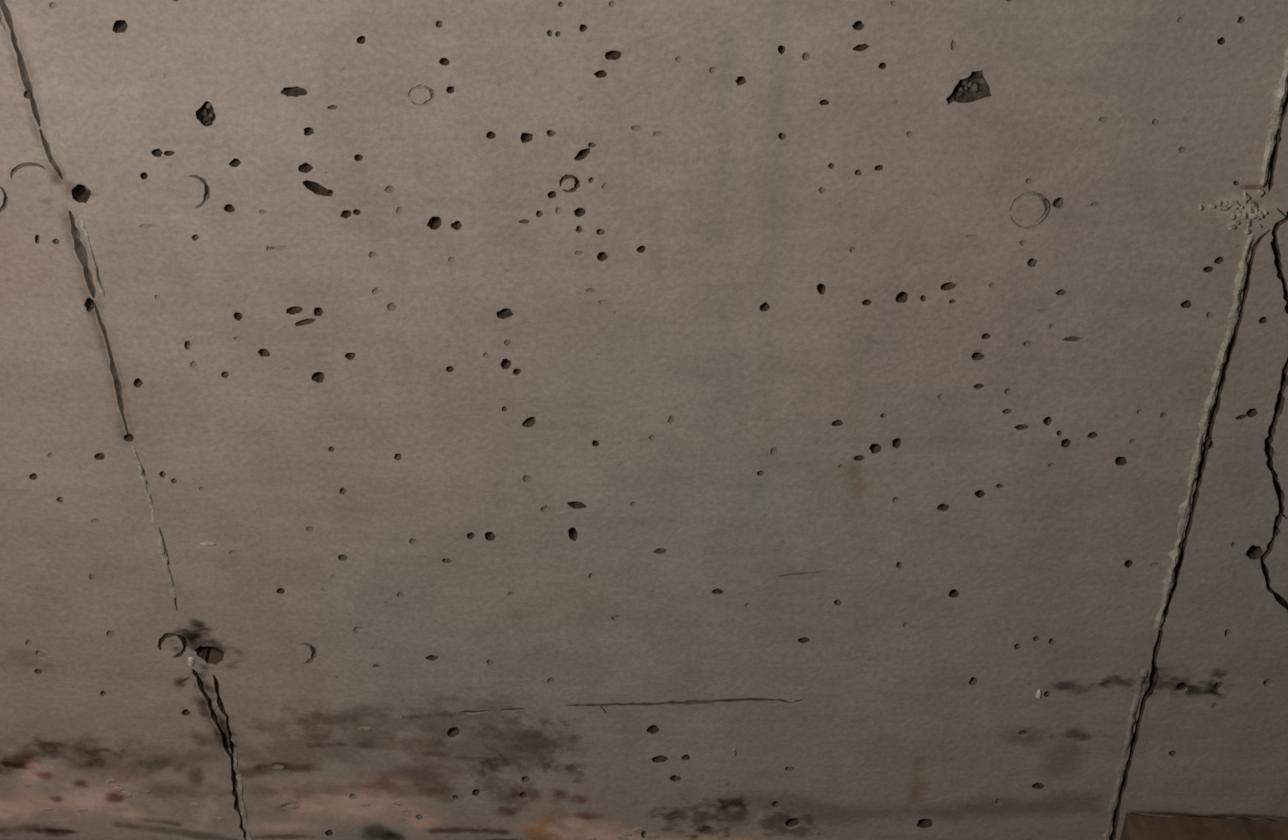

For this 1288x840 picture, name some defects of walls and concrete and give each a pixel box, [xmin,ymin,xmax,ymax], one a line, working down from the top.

crack [1270,207,1288,314]
crack [1260,357,1288,612]
crack [184,669,246,840]